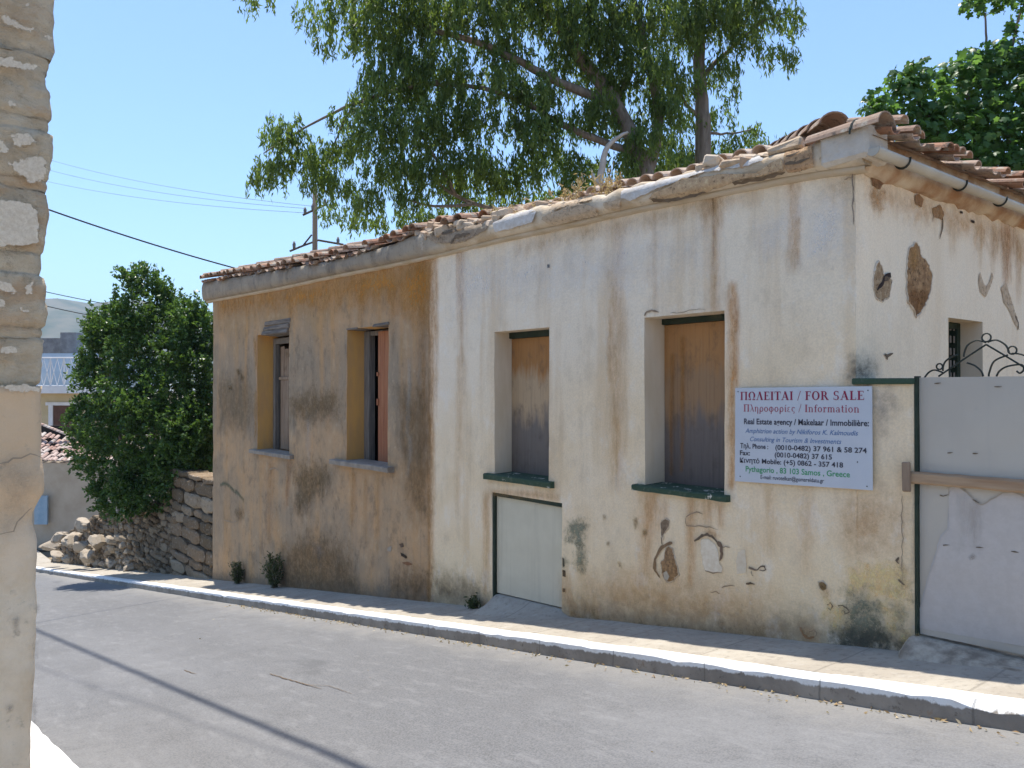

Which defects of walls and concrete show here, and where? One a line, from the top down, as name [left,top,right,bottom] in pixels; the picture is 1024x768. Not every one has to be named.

spalling [915,194,944,238]
spalling [872,260,893,303]
spalling [905,242,933,318]
peeling [979,273,1020,330]
spalling [653,518,680,583]
peeling [694,533,730,574]